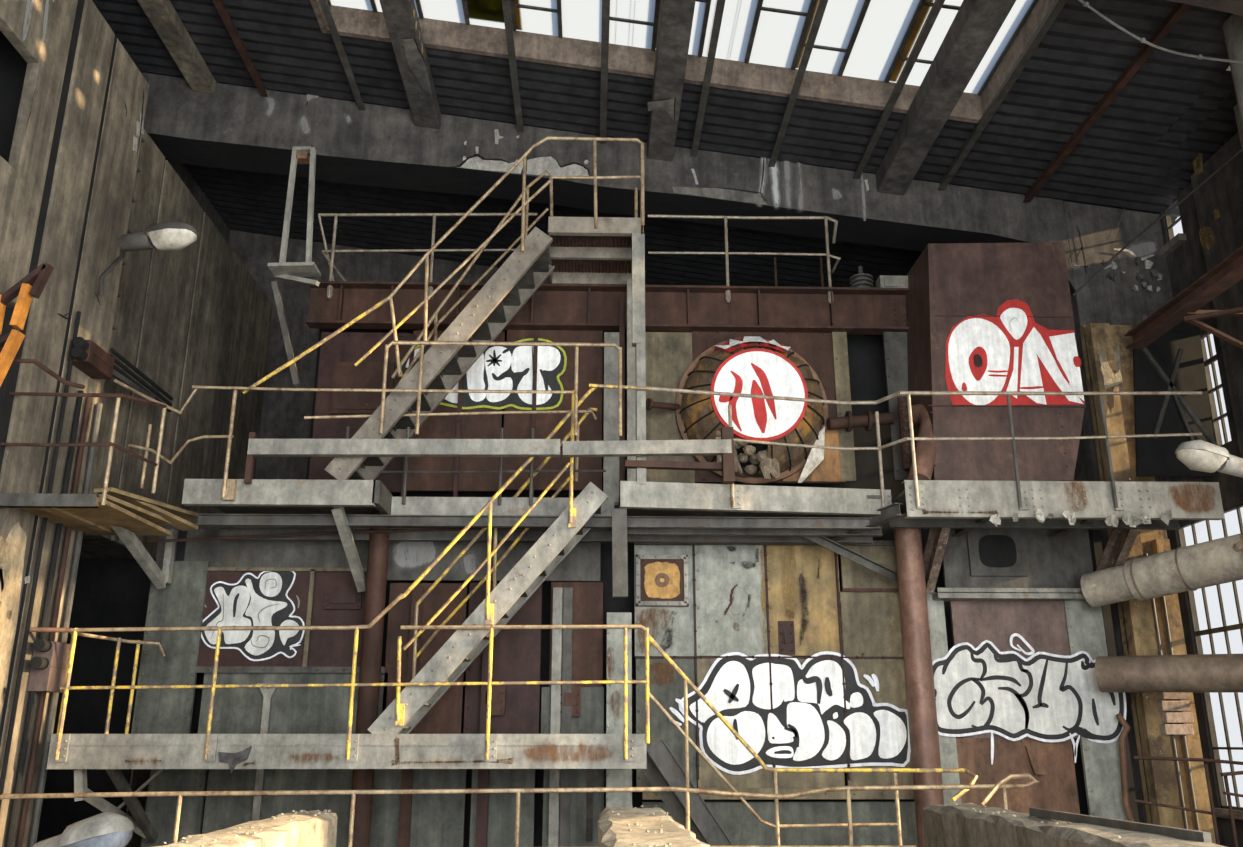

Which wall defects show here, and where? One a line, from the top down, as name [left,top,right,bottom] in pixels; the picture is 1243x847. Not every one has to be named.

spalling [450,129,590,176]
corrosion [1171,484,1215,512]
flaking render [0,515,30,715]